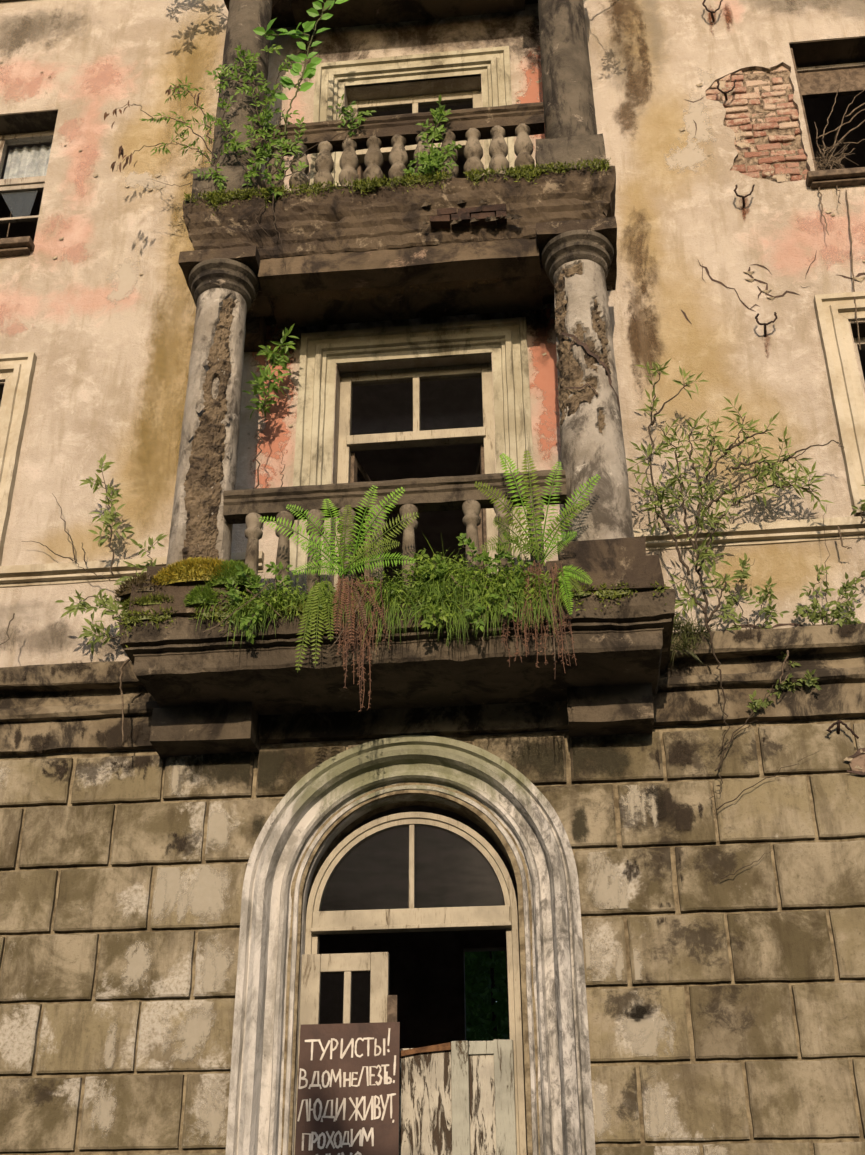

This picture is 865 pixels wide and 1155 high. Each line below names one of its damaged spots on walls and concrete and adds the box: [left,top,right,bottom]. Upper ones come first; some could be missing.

water stain [607,0,649,130]
spalling [666,64,809,183]
crack [698,250,817,312]
crack [840,272,865,282]
spalling [182,297,236,560]
peeling [250,325,297,489]
spalling [530,263,611,459]
water stain [153,866,230,922]
water stain [572,809,639,909]
water stain [621,784,703,832]
spalling [844,748,865,775]
water stain [584,931,674,1056]